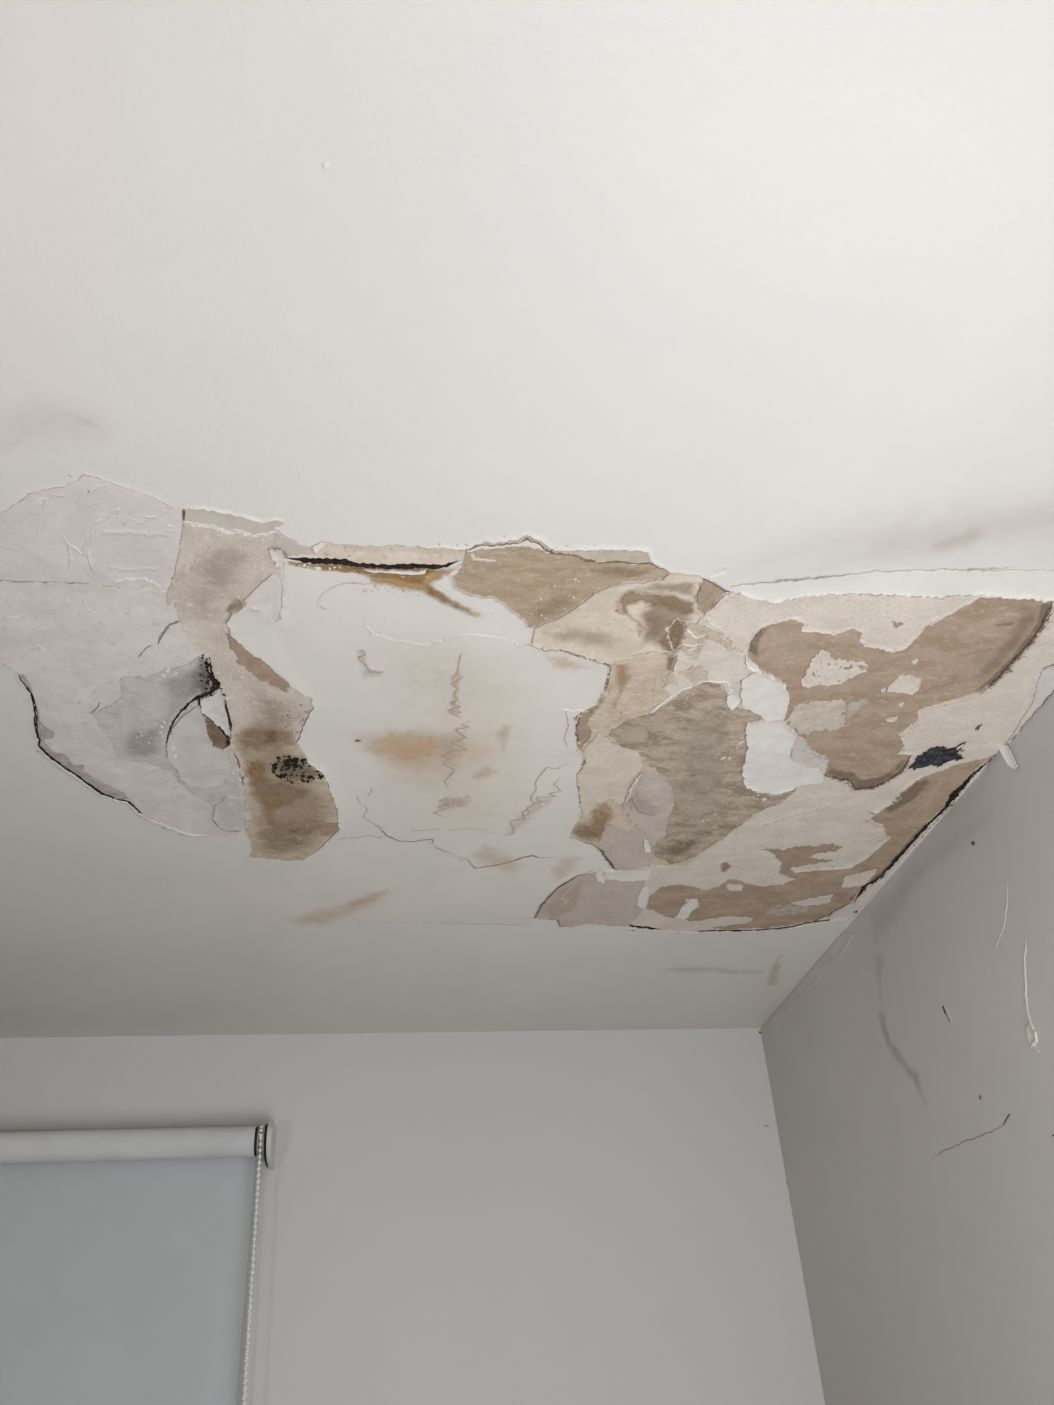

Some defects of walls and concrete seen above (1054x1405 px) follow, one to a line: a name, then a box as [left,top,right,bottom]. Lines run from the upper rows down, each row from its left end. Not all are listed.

crack [269,530,674,652]
crack [0,654,245,839]
mould [247,755,324,784]
leakage [385,655,471,817]
peeling [93,504,1054,933]
mould [909,724,983,770]